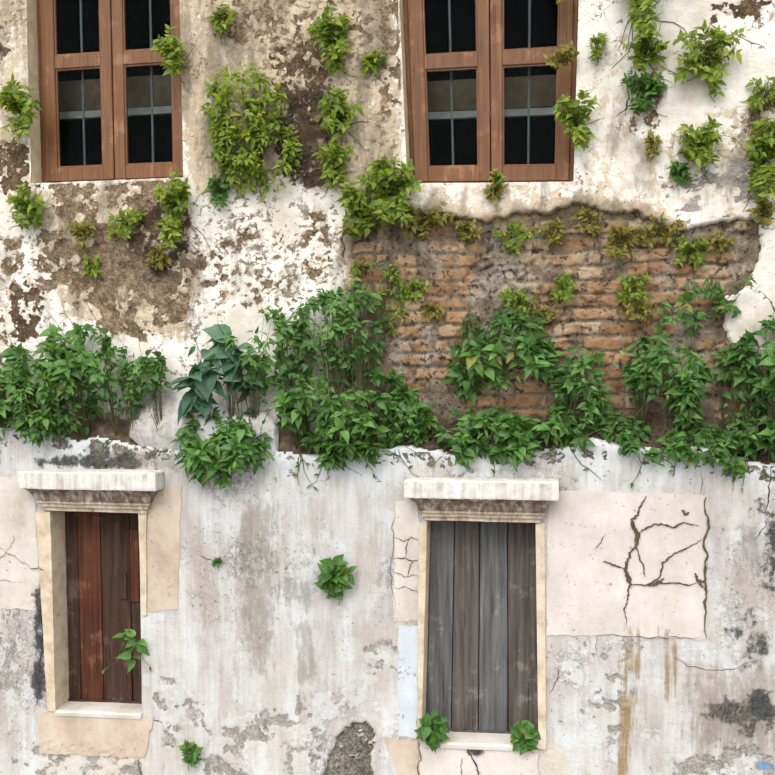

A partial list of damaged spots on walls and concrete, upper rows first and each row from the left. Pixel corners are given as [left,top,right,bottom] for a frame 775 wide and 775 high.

peeling [710,0,771,24]
peeling [0,139,293,375]
spalling [273,205,769,477]
crack [390,505,417,620]
crack [595,476,710,650]
mould [750,498,775,590]
crack [0,537,43,705]
leakage [31,588,46,700]
peeling [152,692,375,775]
rust [618,696,631,775]
rust [665,645,677,698]
mould [701,689,775,737]